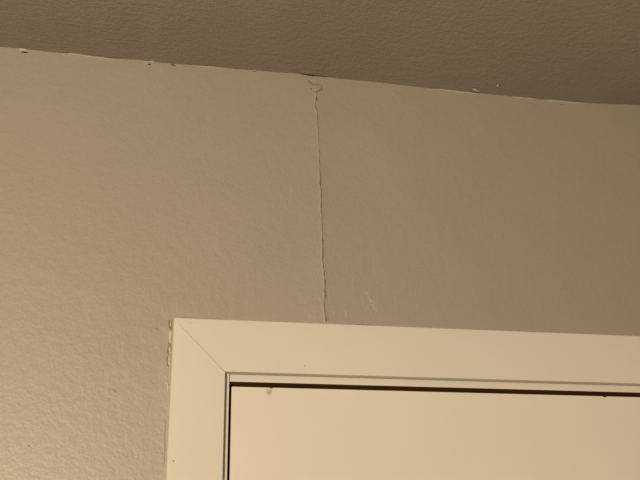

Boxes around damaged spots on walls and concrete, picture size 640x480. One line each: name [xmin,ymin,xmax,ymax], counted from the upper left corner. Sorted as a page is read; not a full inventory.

crack [299,72,329,322]